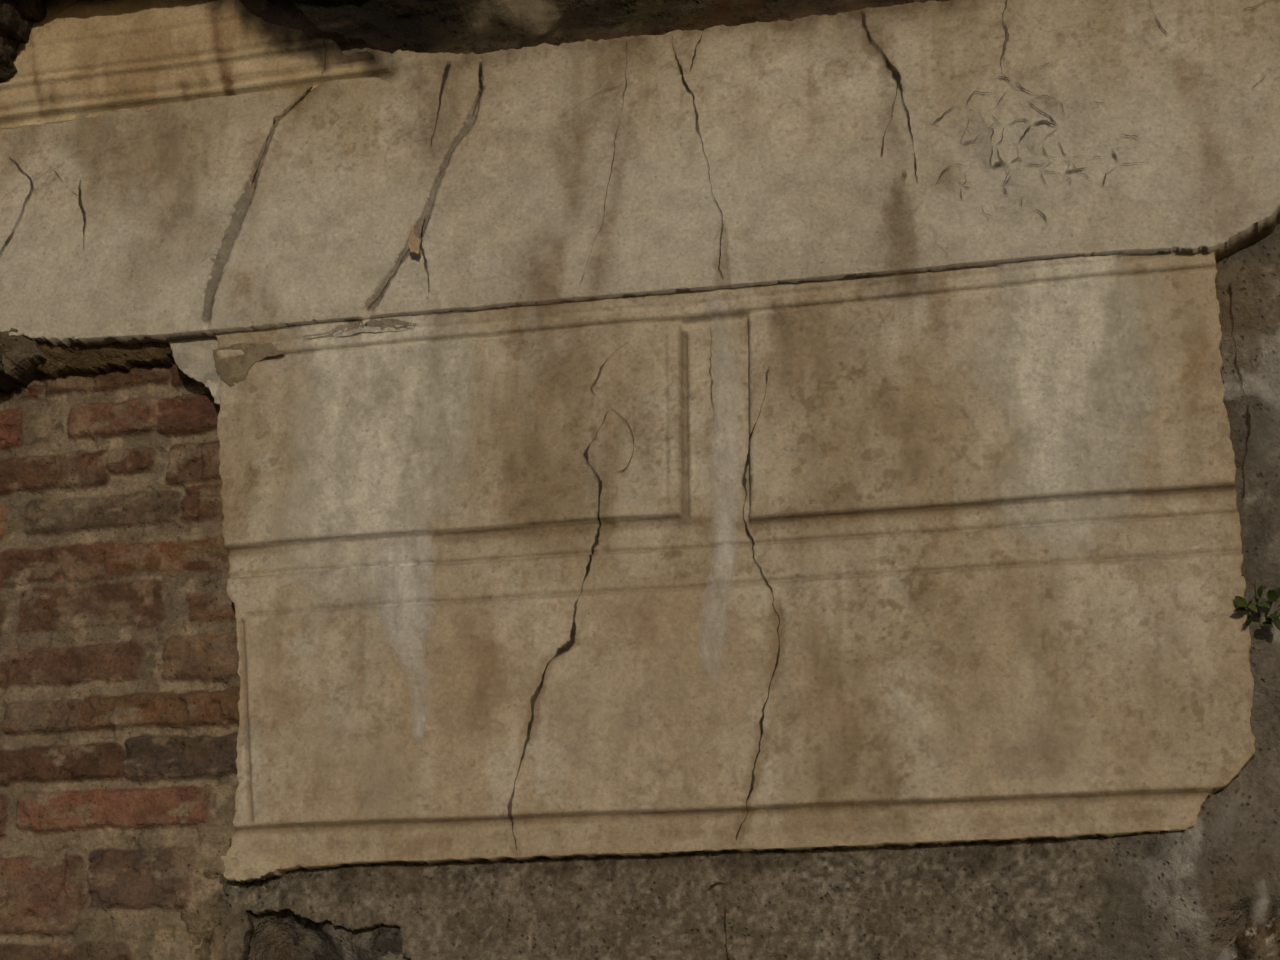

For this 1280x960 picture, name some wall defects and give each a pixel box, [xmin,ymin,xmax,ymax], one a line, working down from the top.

crack [0,158,86,254]
crack [203,41,326,321]
crack [305,62,483,340]
crack [580,43,627,283]
crack [672,35,723,277]
crack [862,0,1142,220]
damp [289,312,471,737]
crack [508,343,634,849]
crack [708,327,716,443]
damp [708,302,738,634]
crack [736,371,780,838]
flaking render [181,856,411,960]